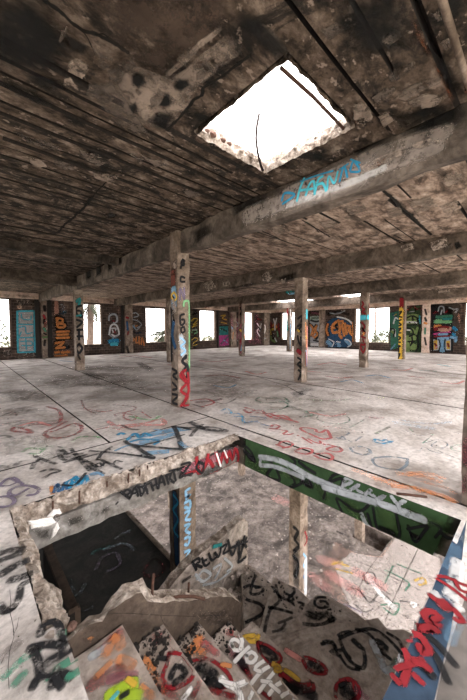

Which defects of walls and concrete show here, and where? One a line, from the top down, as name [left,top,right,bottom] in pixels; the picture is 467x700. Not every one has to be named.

crack [42,0,130,54]
flaking render [63,61,88,88]
leakage [151,113,173,127]
spalling [194,52,445,173]
crack [57,182,107,232]
spalling [10,433,239,639]